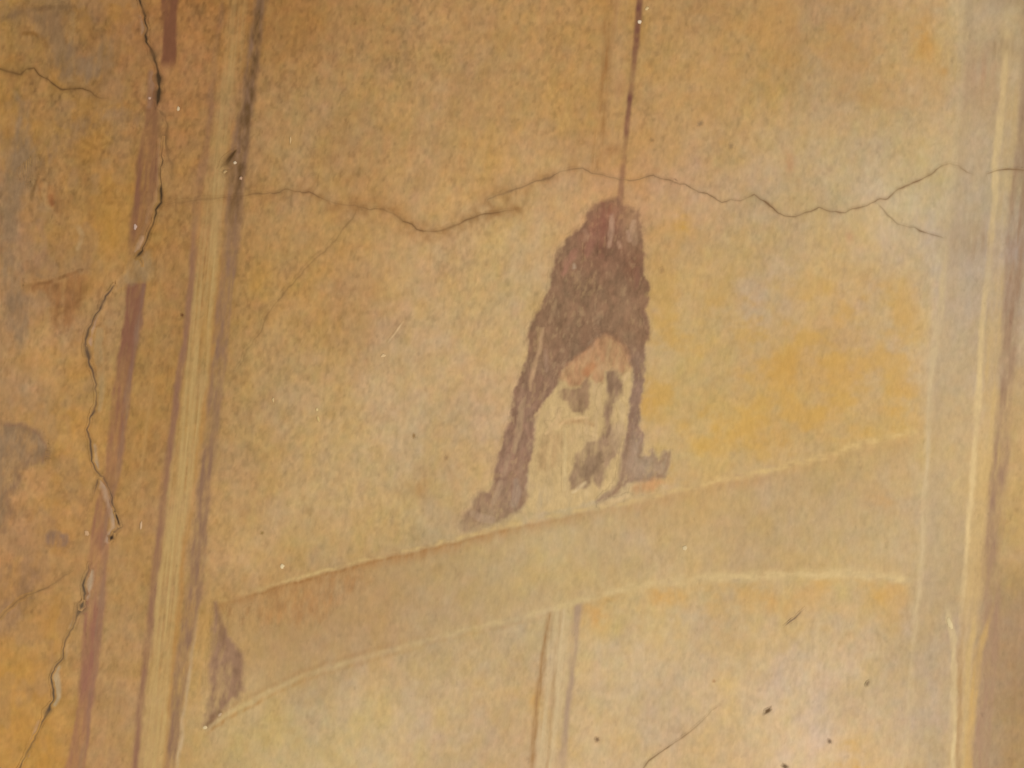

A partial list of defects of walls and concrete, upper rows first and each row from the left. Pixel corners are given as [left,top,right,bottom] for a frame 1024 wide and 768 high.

crack [0,66,110,101]
crack [132,0,1024,374]
crack [0,283,124,768]